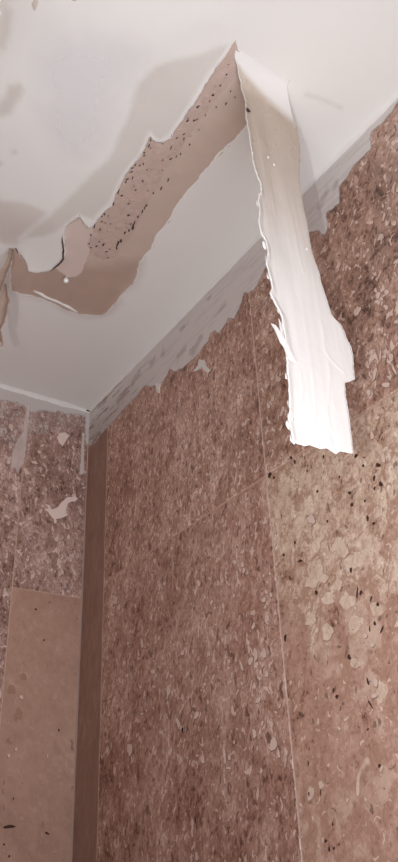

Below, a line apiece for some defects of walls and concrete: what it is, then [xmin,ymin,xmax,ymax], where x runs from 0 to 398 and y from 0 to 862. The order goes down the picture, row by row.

peeling [0,40,355,454]